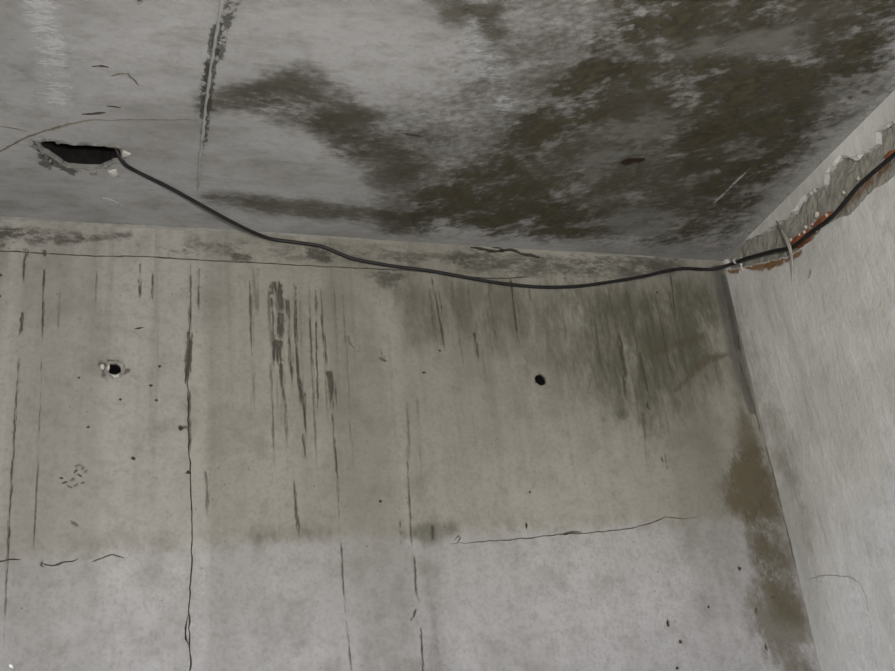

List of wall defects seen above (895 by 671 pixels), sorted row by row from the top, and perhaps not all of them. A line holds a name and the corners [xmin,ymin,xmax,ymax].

crack [92,65,139,86]
crack [0,106,195,152]
leakage [199,0,895,261]
spalling [729,120,895,270]
crack [0,250,429,346]
crack [470,247,543,279]
corrosion [728,250,802,274]
leakage [269,281,337,454]
crack [451,517,699,544]
leakage [754,530,808,671]